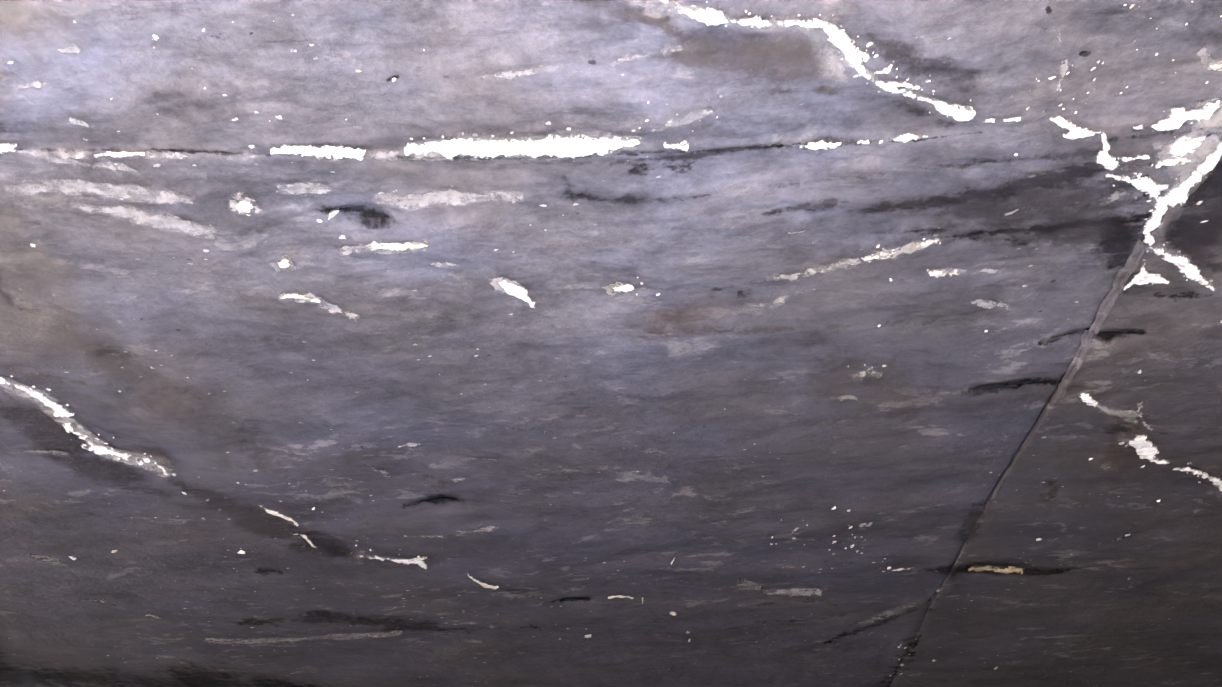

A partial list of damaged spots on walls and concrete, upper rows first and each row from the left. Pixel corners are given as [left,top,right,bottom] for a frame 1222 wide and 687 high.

crack [0,0,1021,162]
crack [1014,153,1067,180]
crack [1050,100,1222,291]
leakage [1166,162,1222,272]
peeling [490,278,535,308]
crack [0,375,208,501]
crack [1079,393,1222,491]
crack [258,505,317,548]
crack [355,545,427,570]
crack [467,574,499,590]